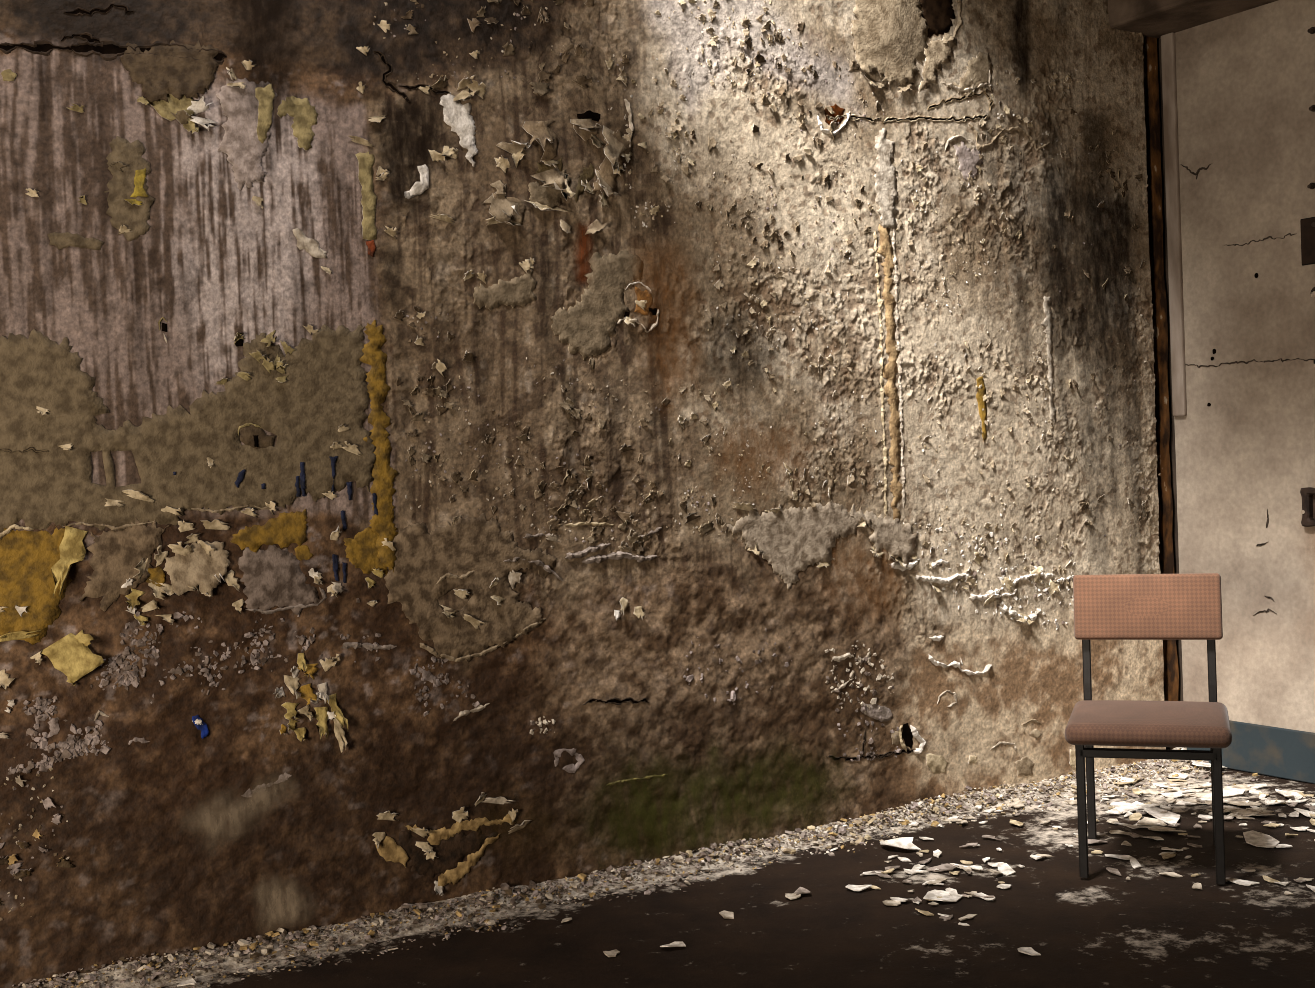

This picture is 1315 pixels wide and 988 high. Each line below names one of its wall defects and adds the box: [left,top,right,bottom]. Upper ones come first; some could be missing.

crack [0,4,227,65]
peeling [120,40,318,209]
peeling [293,228,332,275]
rust [578,226,590,280]
peeling [330,0,1152,662]
damp [1040,185,1129,340]
peeling [0,324,376,686]
peeling [0,669,15,690]